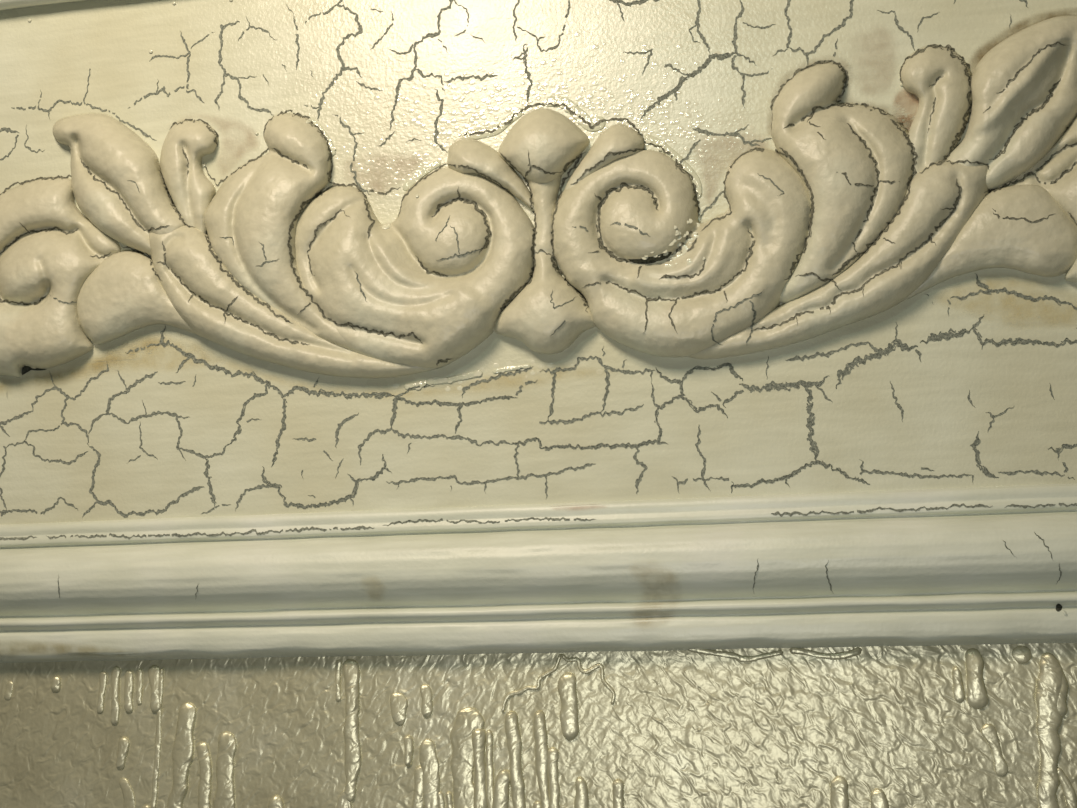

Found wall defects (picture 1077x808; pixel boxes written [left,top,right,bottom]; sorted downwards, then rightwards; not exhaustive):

crack [0,0,1077,584]